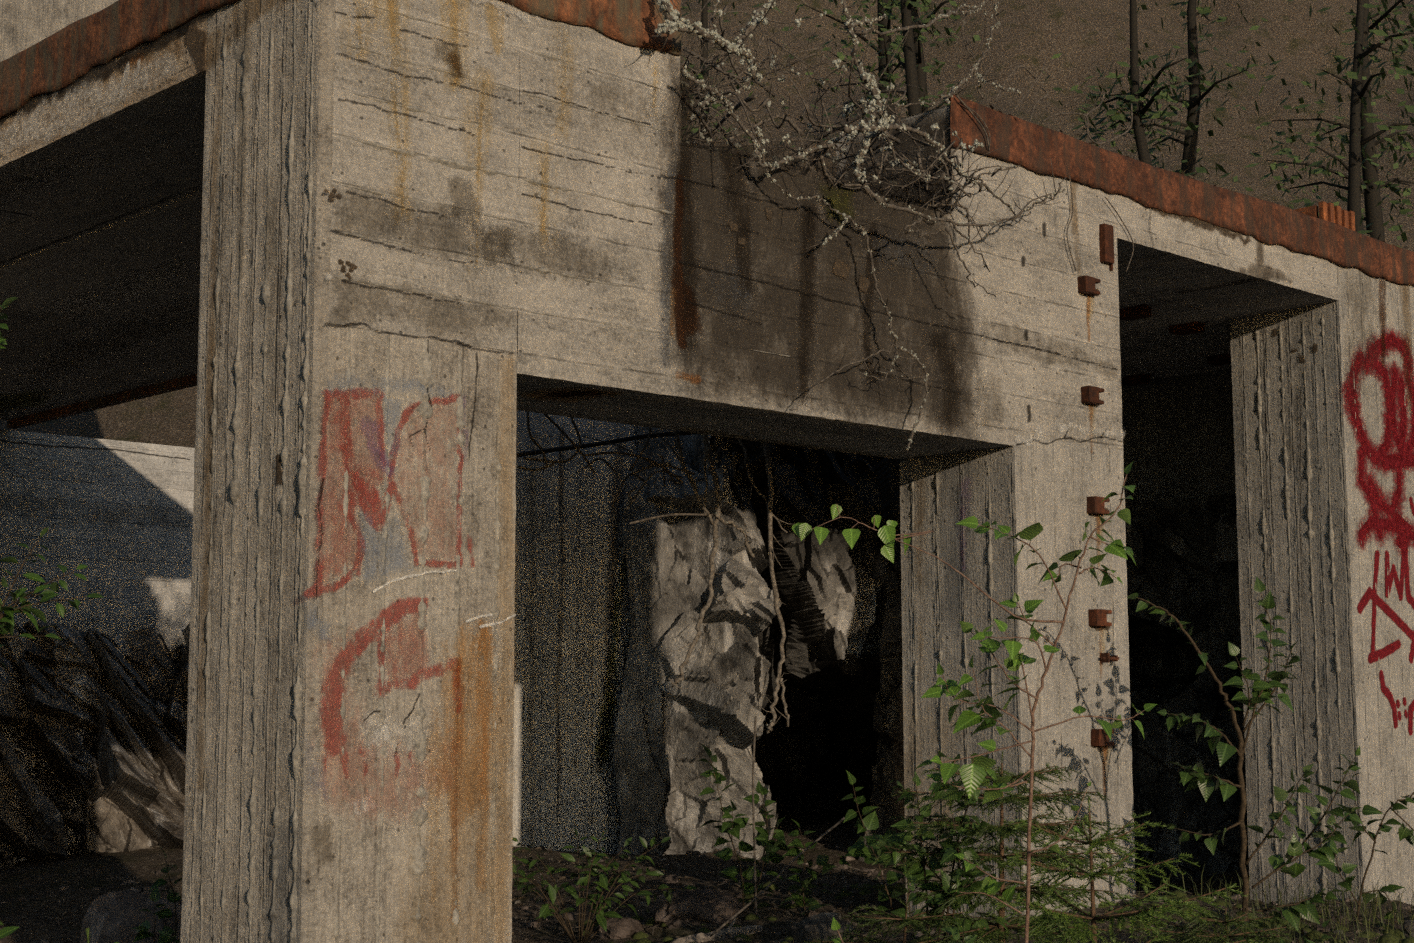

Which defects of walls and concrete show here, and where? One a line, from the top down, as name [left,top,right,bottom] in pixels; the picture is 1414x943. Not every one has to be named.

corrosion [673,177,697,346]
water stain [666,118,971,424]